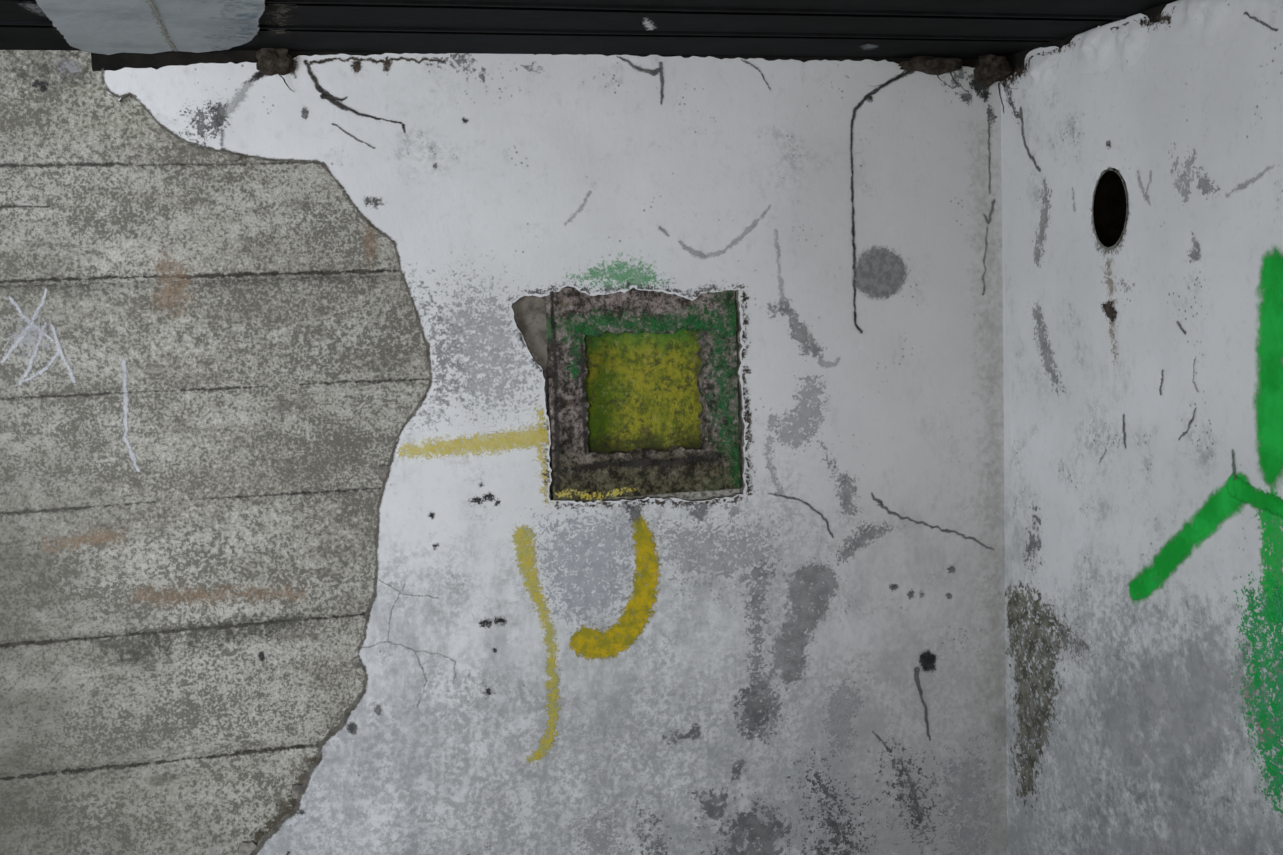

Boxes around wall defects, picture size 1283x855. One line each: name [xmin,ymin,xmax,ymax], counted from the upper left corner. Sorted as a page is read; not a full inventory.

crack [303,60,405,149]
spalling [290,53,486,83]
crack [659,206,770,258]
crack [850,70,915,333]
spalling [0,50,432,855]
crack [769,493,833,538]
crack [871,493,994,550]
damp [1005,506,1093,811]